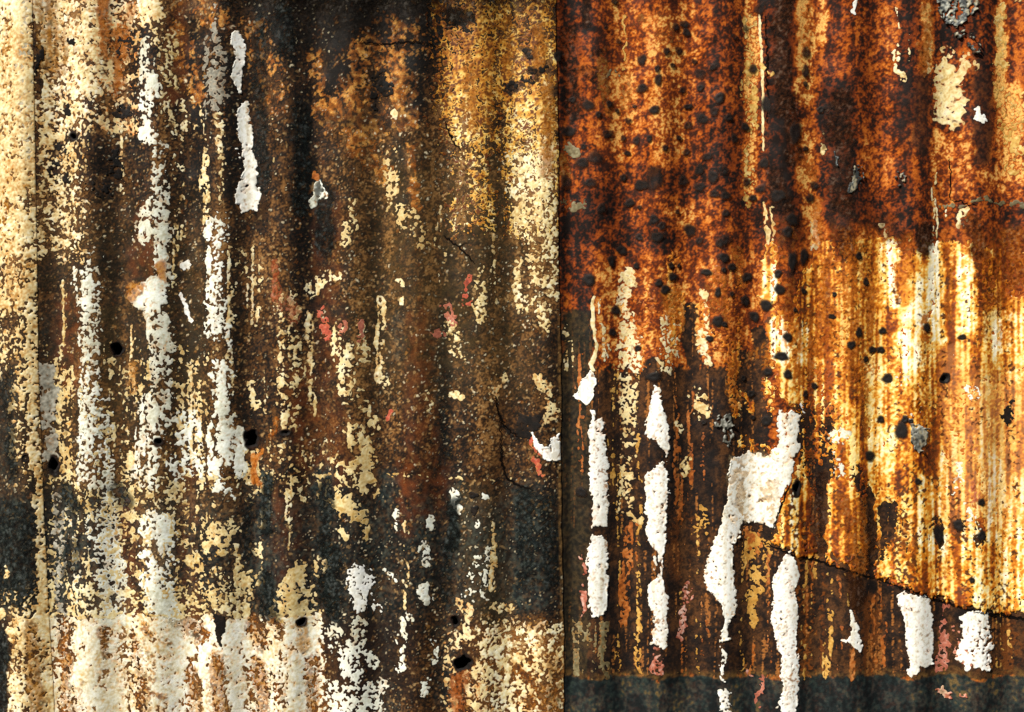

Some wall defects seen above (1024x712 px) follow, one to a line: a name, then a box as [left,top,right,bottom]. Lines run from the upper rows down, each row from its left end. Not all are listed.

rust [96,0,129,97]
rust [767,0,812,213]
rust [915,222,933,256]
peeling [0,0,434,712]
crack [495,396,531,490]
rust [574,354,585,474]
rust [672,372,705,529]
peeling [382,0,1024,712]
rust [618,522,639,627]
rust [742,526,772,675]
rust [836,626,856,682]
rust [836,572,888,673]